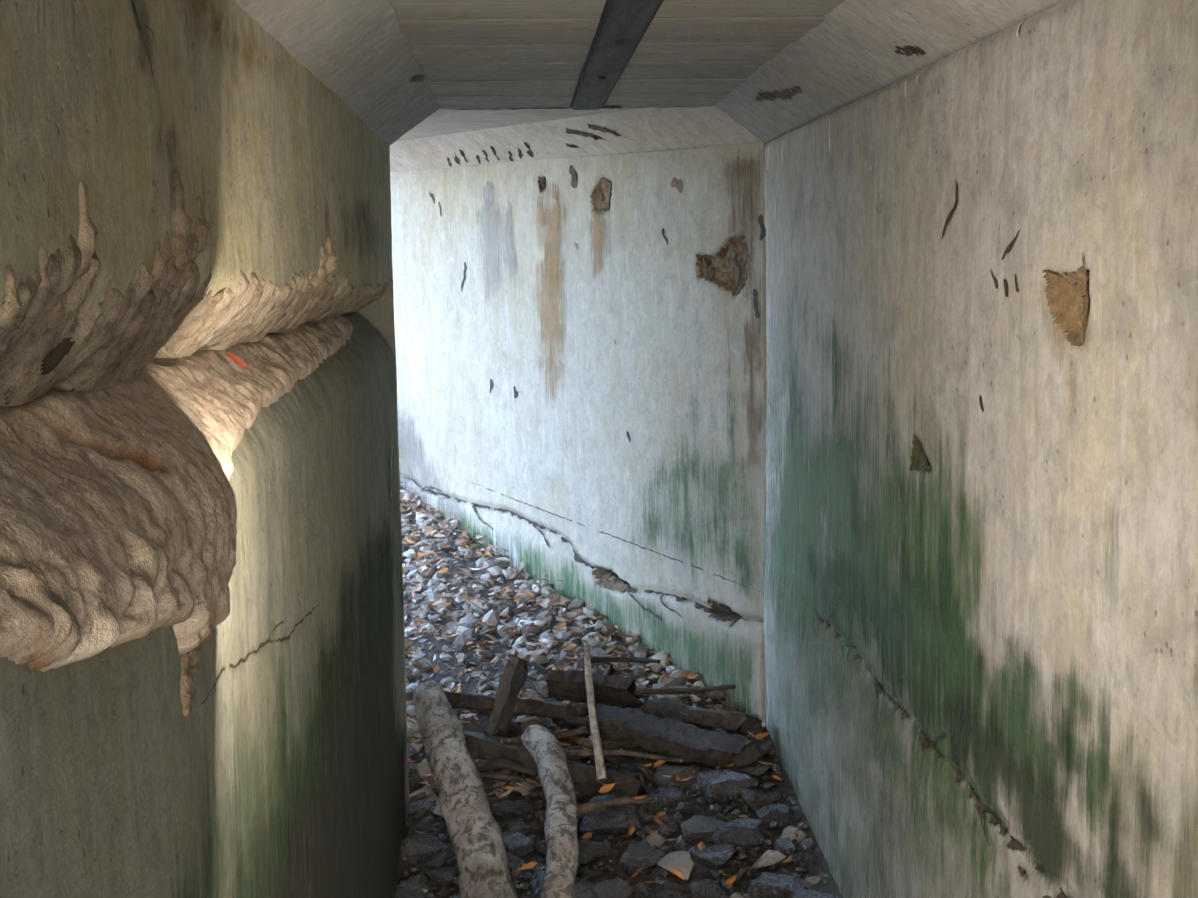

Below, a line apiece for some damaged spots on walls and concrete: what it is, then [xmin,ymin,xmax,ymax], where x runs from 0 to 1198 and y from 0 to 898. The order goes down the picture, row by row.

corrosion [536,186,565,394]
spalling [566,123,626,148]
spalling [590,177,612,212]
spalling [695,199,777,318]
spalling [990,230,1020,297]
spalling [1042,257,1090,346]
damp [0,172,368,720]
crack [403,477,763,622]
crack [199,606,317,707]
damp [240,517,406,898]
crack [800,594,1068,898]
damp [944,691,1131,898]